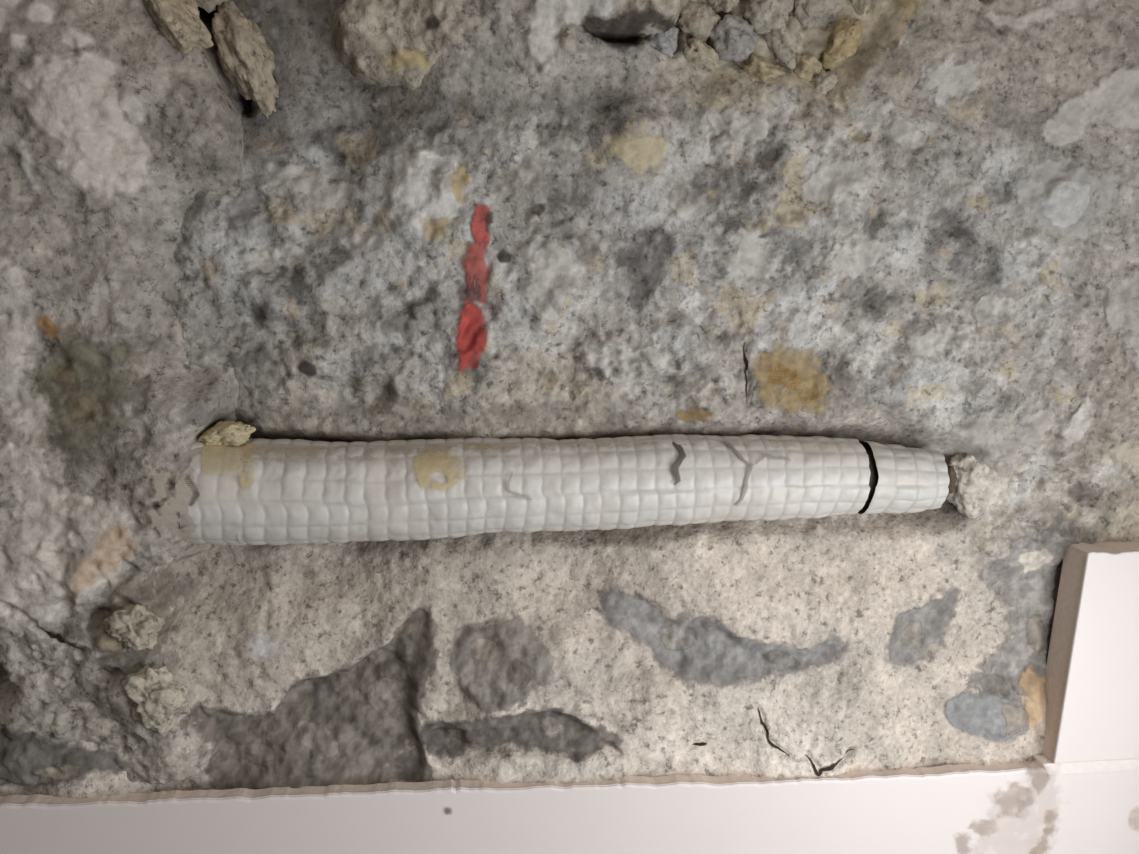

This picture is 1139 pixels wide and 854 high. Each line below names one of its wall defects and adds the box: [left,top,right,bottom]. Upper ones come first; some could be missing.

spalling [172,0,1134,742]
spalling [0,728,134,786]
spalling [78,569,195,665]
spalling [181,609,622,790]